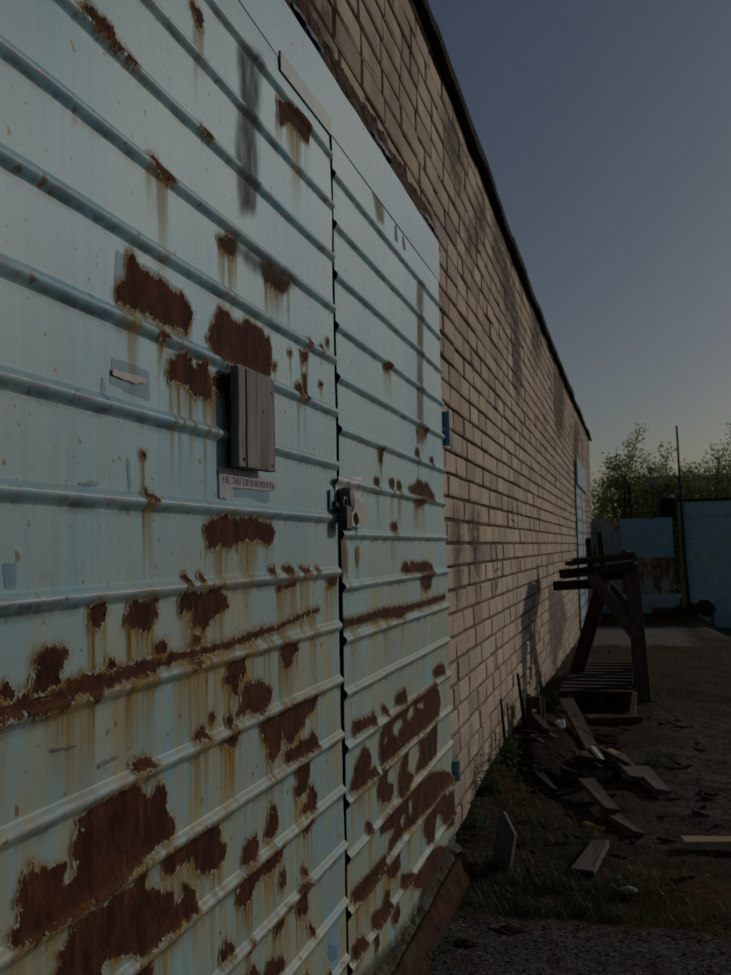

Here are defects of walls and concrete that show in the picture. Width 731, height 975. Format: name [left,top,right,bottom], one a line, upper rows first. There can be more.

corrosion [79,0,141,72]
corrosion [276,94,313,148]
corrosion [263,261,292,299]
corrosion [115,247,279,438]
corrosion [288,337,330,402]
corrosion [269,537,360,608]
corrosion [0,510,324,975]
corrosion [329,662,457,975]